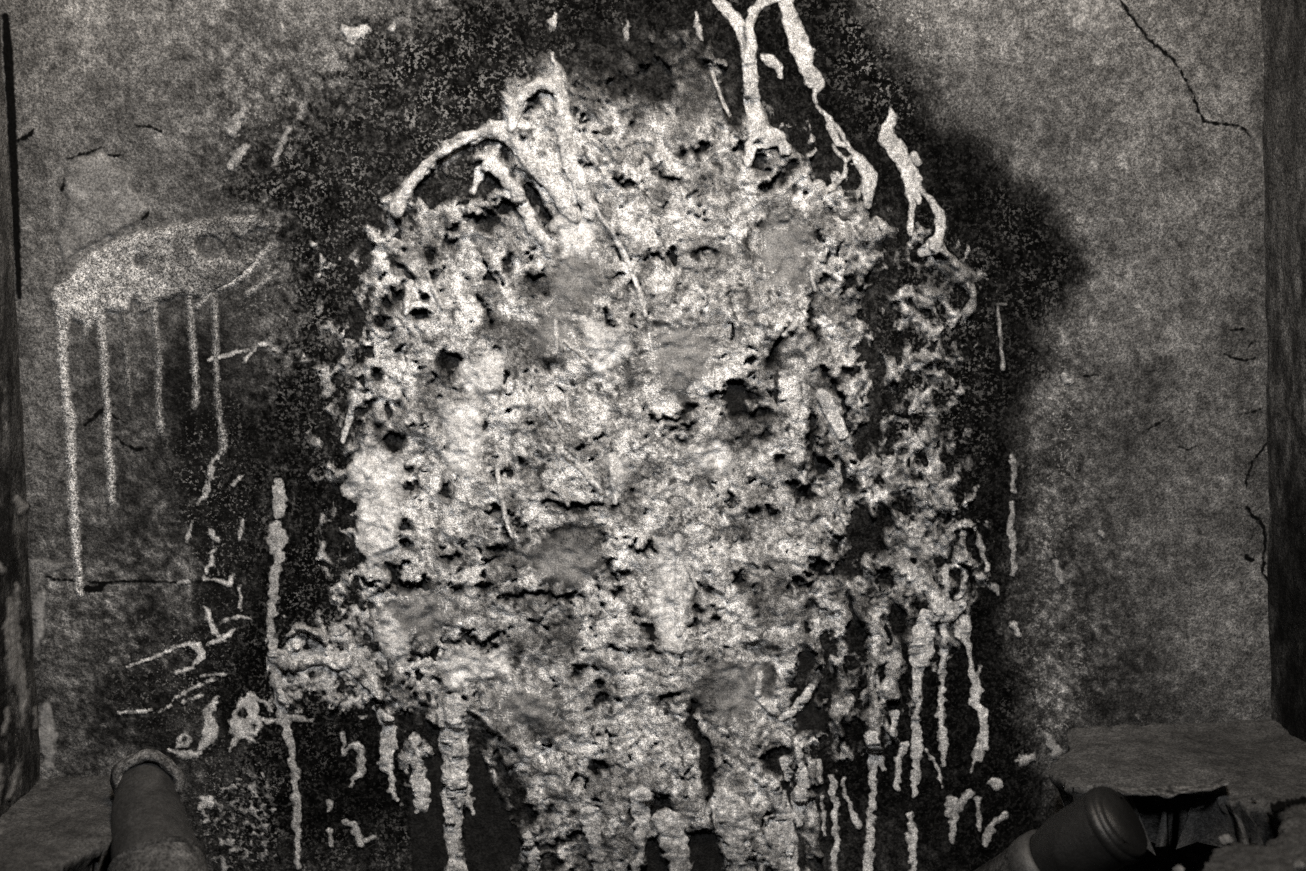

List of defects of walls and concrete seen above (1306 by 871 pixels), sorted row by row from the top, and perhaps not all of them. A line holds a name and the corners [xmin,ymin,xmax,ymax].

damp [50,0,1093,871]
crack [1120,0,1251,137]